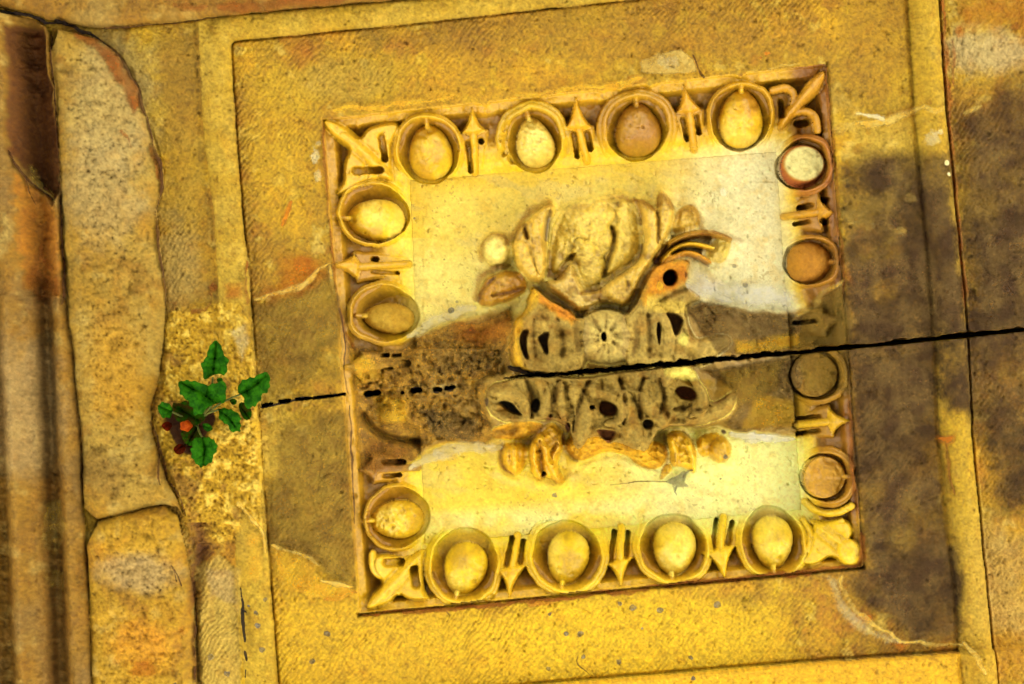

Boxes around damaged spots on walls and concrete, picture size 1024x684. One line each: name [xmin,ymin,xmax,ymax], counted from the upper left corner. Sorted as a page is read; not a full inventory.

crack [507,328,1024,377]
damp [686,86,1024,642]